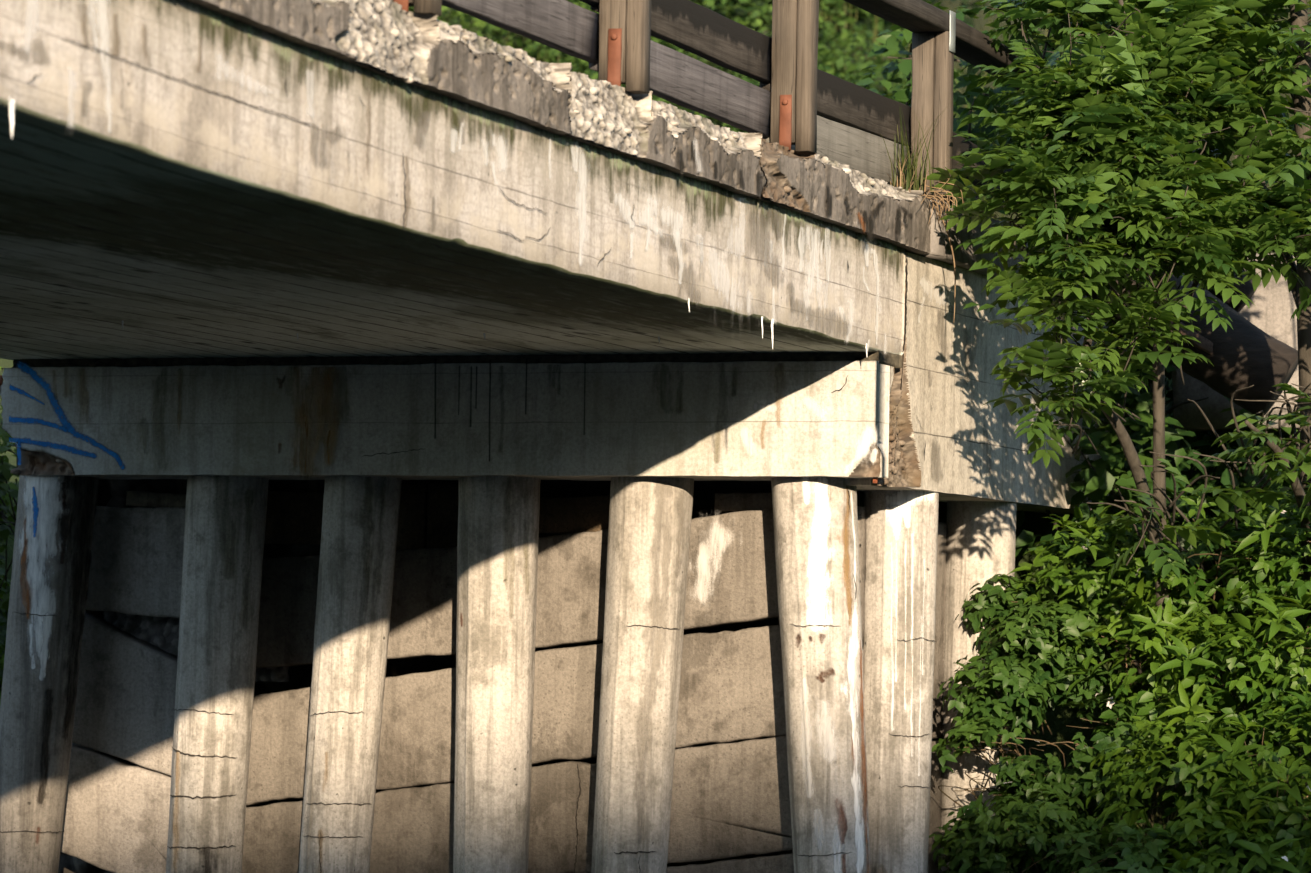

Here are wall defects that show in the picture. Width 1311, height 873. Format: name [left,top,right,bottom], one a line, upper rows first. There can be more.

spalling [311,0,924,212]
damp [616,194,750,312]
damp [731,205,852,341]
damp [827,187,913,289]
spalling [0,421,75,476]
damp [803,477,832,632]
spalling [849,261,921,487]
damp [886,447,939,546]
damp [21,475,96,804]
damp [844,494,864,873]
corrosion [852,640,886,873]
corrosion [839,806,847,873]